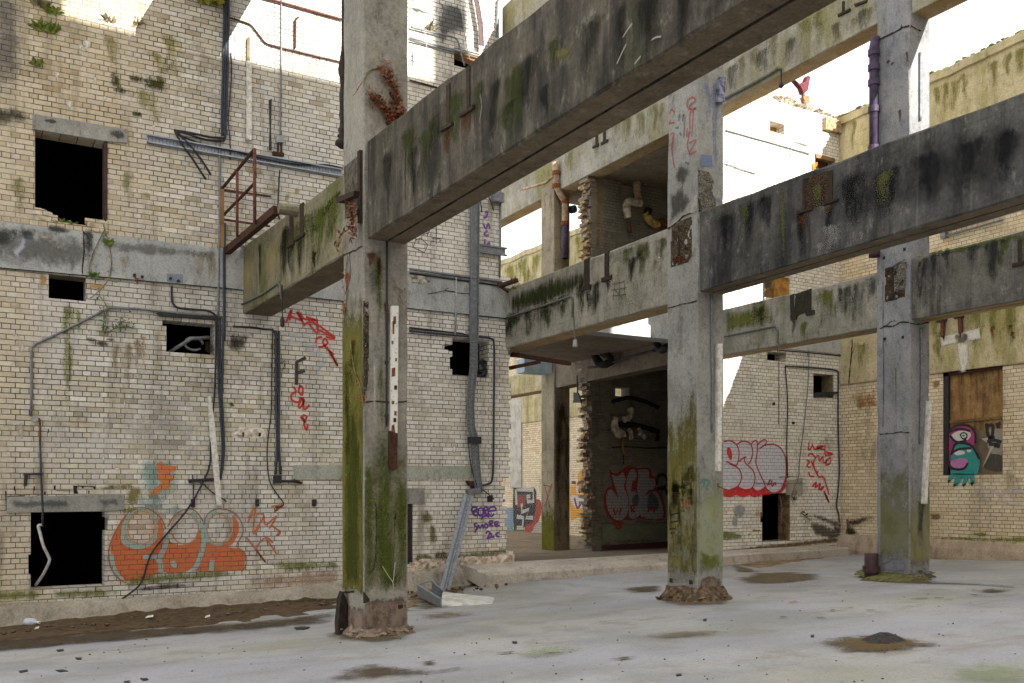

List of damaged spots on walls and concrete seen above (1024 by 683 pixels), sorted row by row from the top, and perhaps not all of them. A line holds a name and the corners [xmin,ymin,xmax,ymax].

water stain [439,5,464,38]
water stain [583,16,600,64]
water stain [401,56,547,192]
water stain [912,129,1017,190]
water stain [843,167,898,220]
spalling [671,170,716,267]
water stain [719,195,771,243]
spalling [885,262,906,302]
water stain [916,250,949,297]
water stain [970,236,1022,279]
water stain [345,343,366,426]
water stain [733,515,867,550]